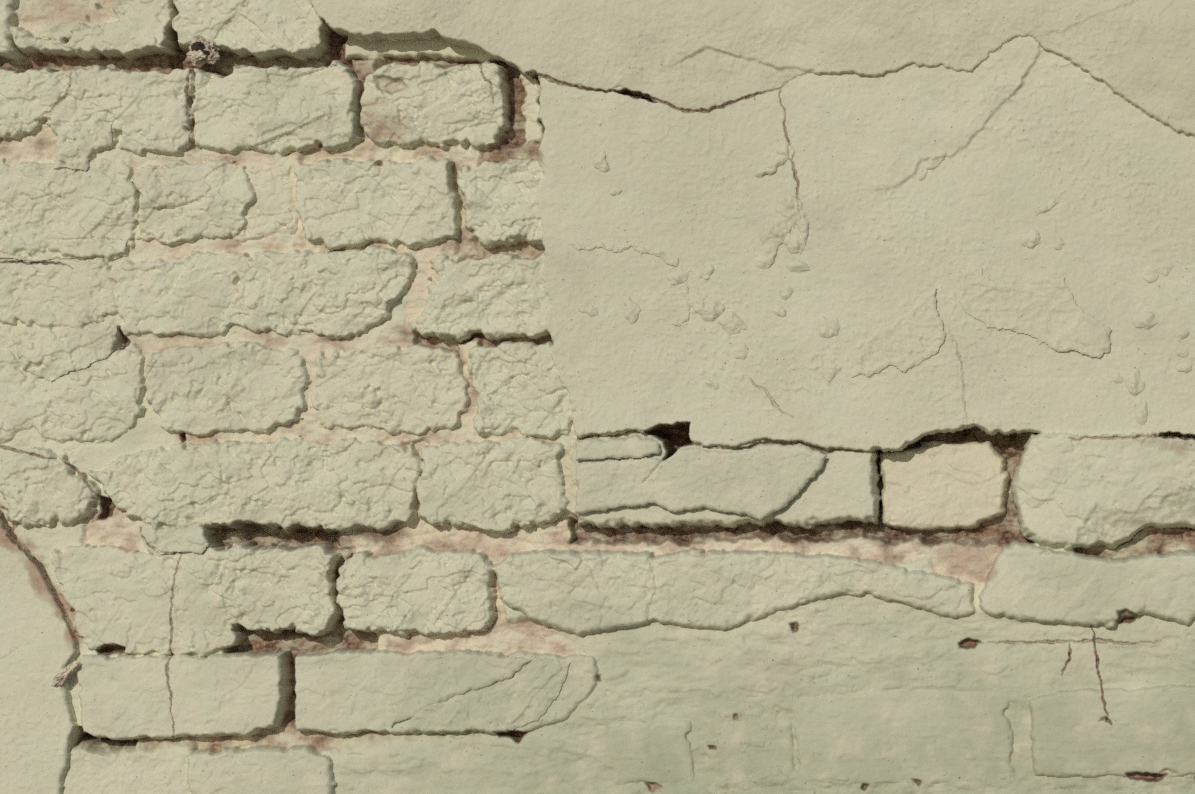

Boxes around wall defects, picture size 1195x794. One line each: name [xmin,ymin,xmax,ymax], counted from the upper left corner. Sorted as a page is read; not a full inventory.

peeling [53,122,115,171]
crack [525,72,799,199]
crack [0,446,98,495]
spalling [575,435,827,521]
peeling [141,520,222,554]
peeling [390,649,570,734]
crack [978,625,1162,725]